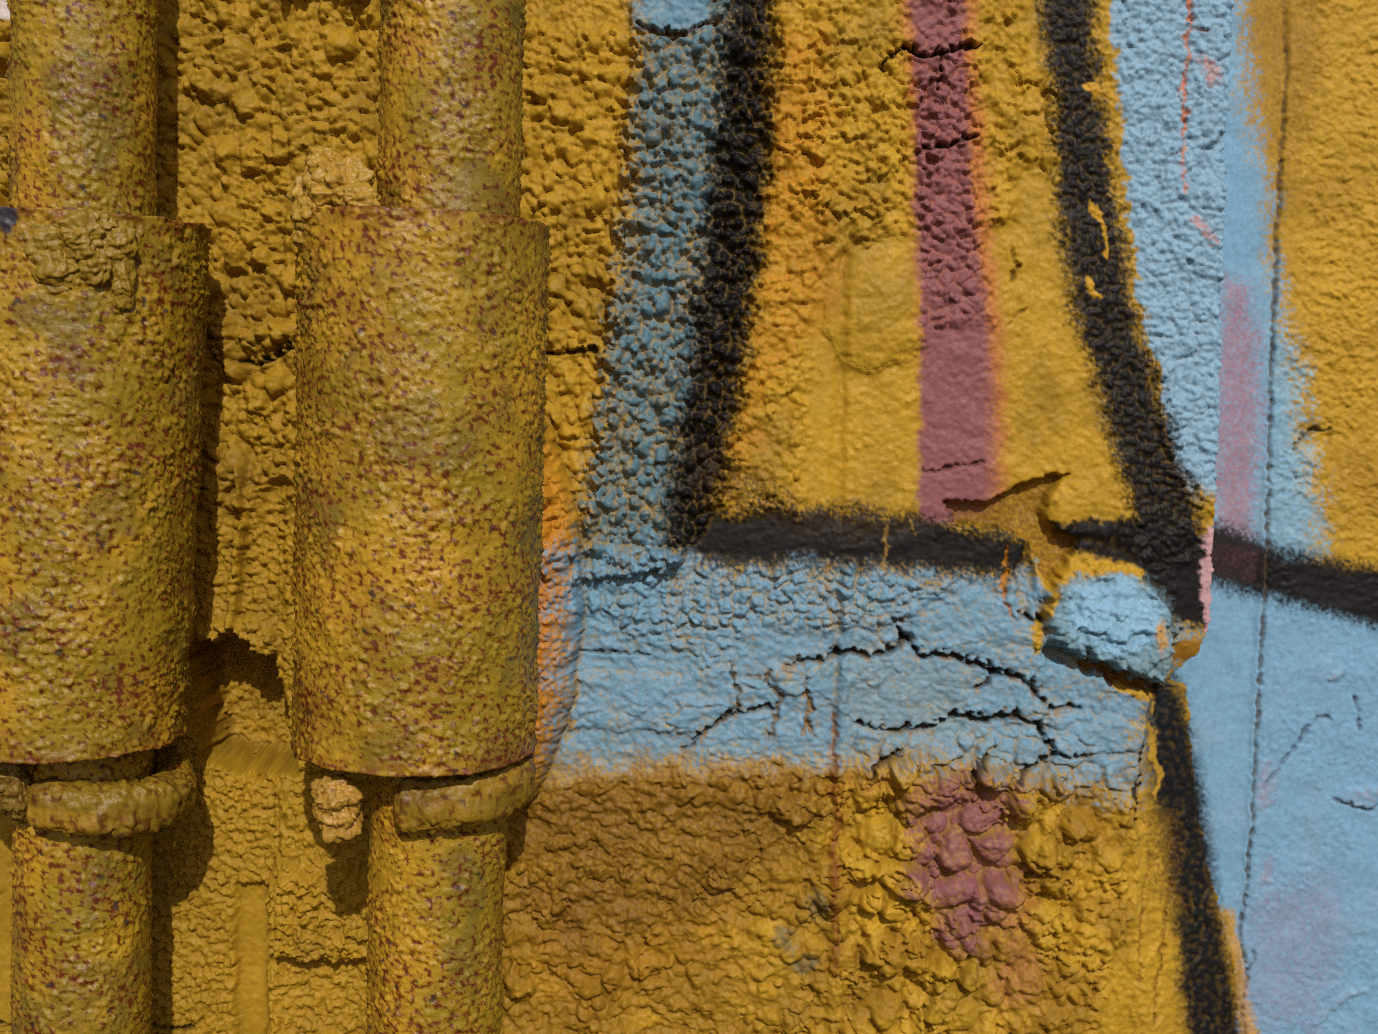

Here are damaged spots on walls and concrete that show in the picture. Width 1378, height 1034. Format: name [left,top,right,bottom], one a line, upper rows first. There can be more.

crack [881,42,981,91]
crack [915,135,979,157]
crack [681,617,1081,787]